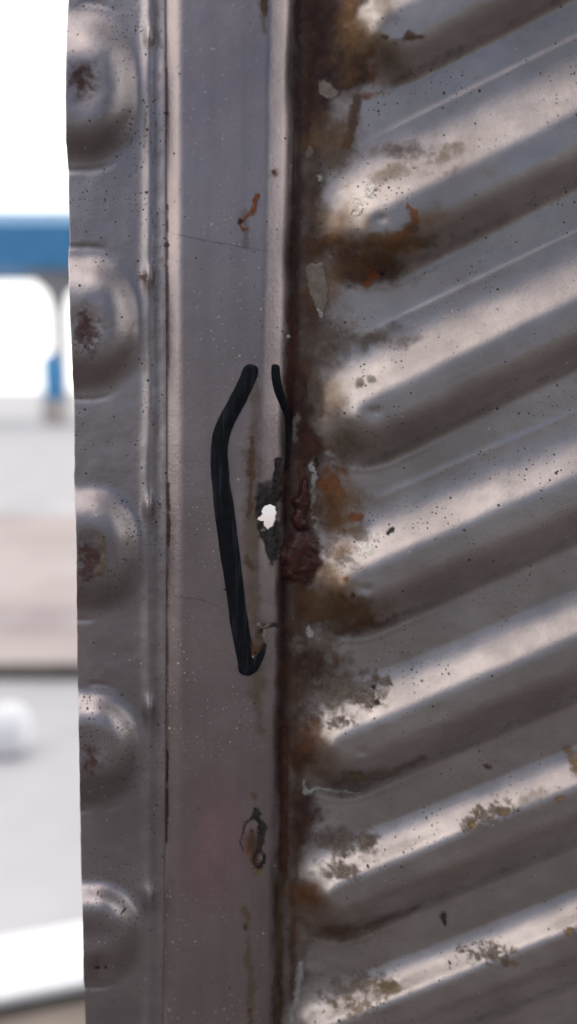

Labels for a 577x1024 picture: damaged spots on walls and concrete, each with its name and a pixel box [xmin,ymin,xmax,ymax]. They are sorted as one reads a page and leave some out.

corrosion [237,193,260,231]
corrosion [282,0,428,540]
corrosion [250,569,323,1024]